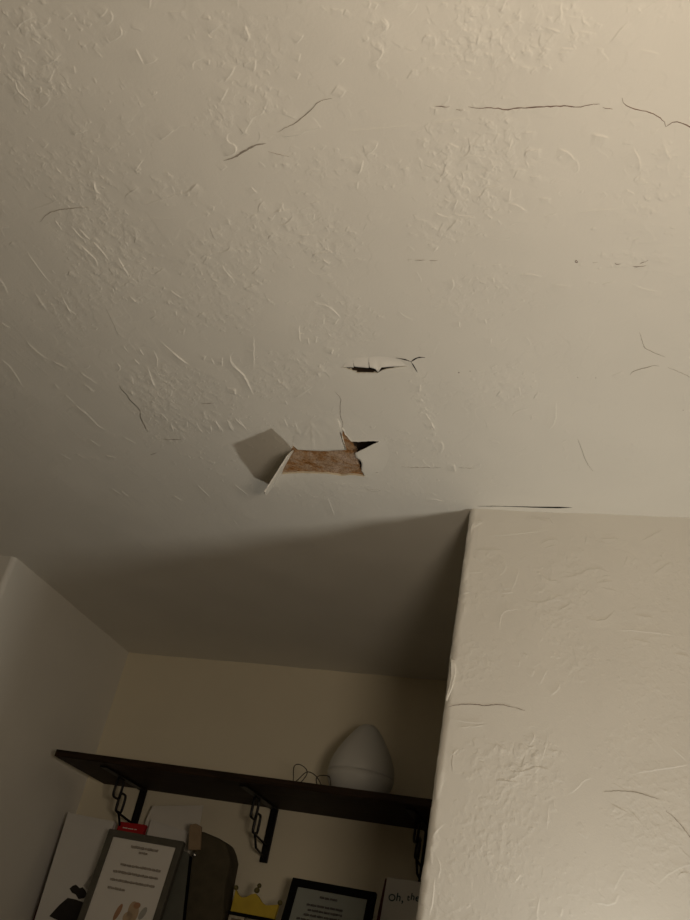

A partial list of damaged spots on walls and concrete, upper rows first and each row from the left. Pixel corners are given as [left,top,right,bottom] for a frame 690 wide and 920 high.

crack [436,99,690,127]
peeling [292,415,389,477]